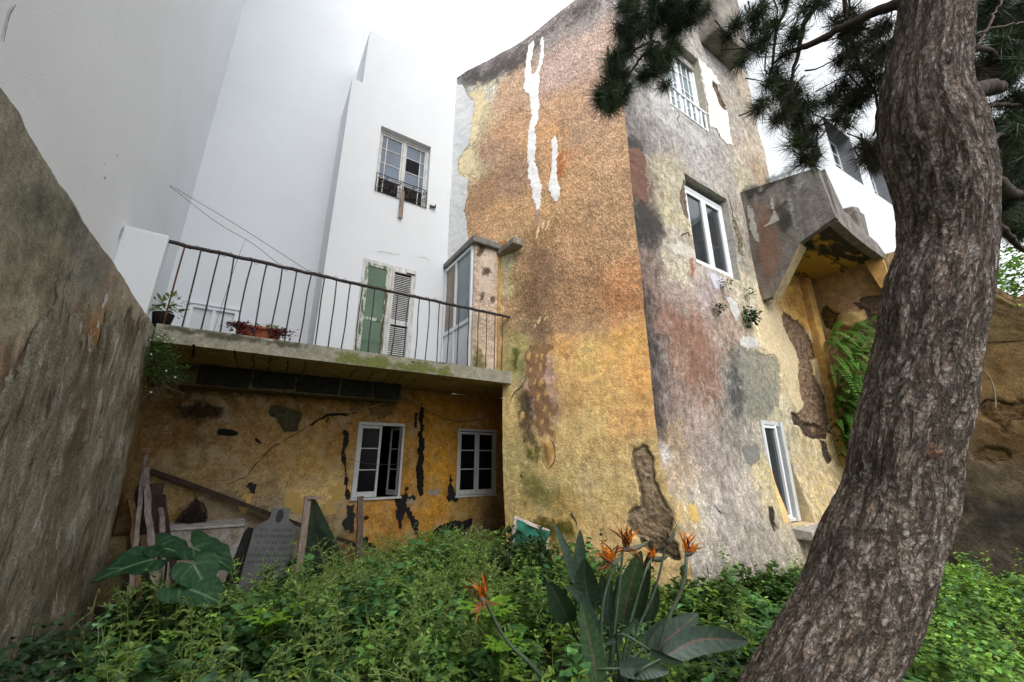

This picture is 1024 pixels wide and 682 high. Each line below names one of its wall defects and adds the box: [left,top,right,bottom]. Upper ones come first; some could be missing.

peeling [458,81,493,176]
peeling [698,59,734,145]
peeling [726,297,740,321]
peeling [518,343,559,440]
flaking render [740,287,832,464]
crack [230,425,309,484]
flaking render [628,445,680,561]
peeling [770,468,790,524]